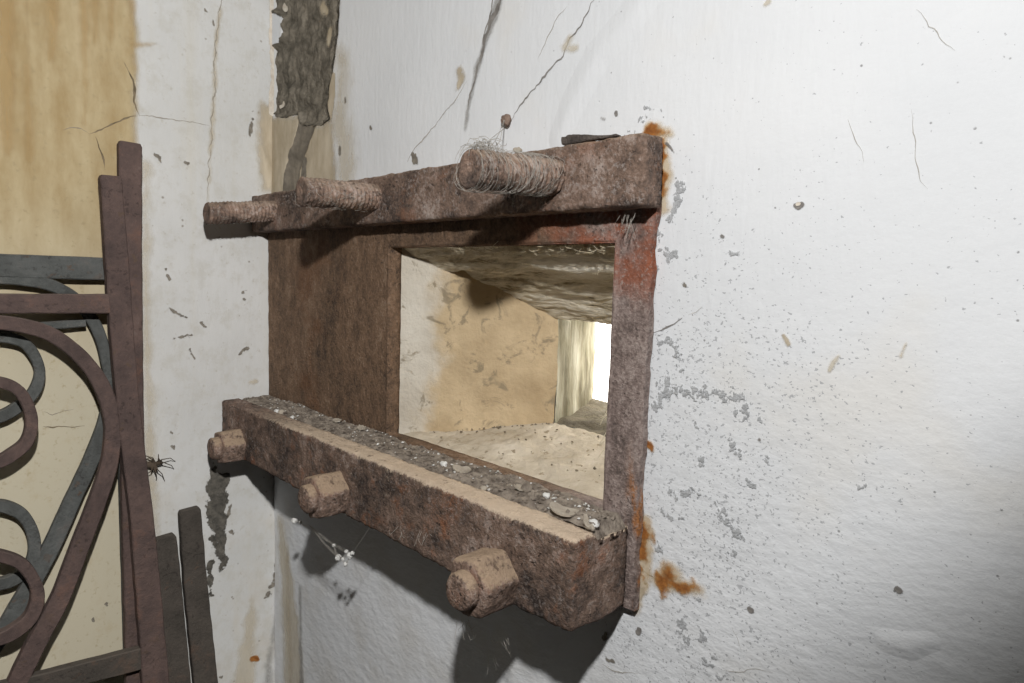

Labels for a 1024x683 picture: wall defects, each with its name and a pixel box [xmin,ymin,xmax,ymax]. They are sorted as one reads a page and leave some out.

corrosion [639,516,696,599]